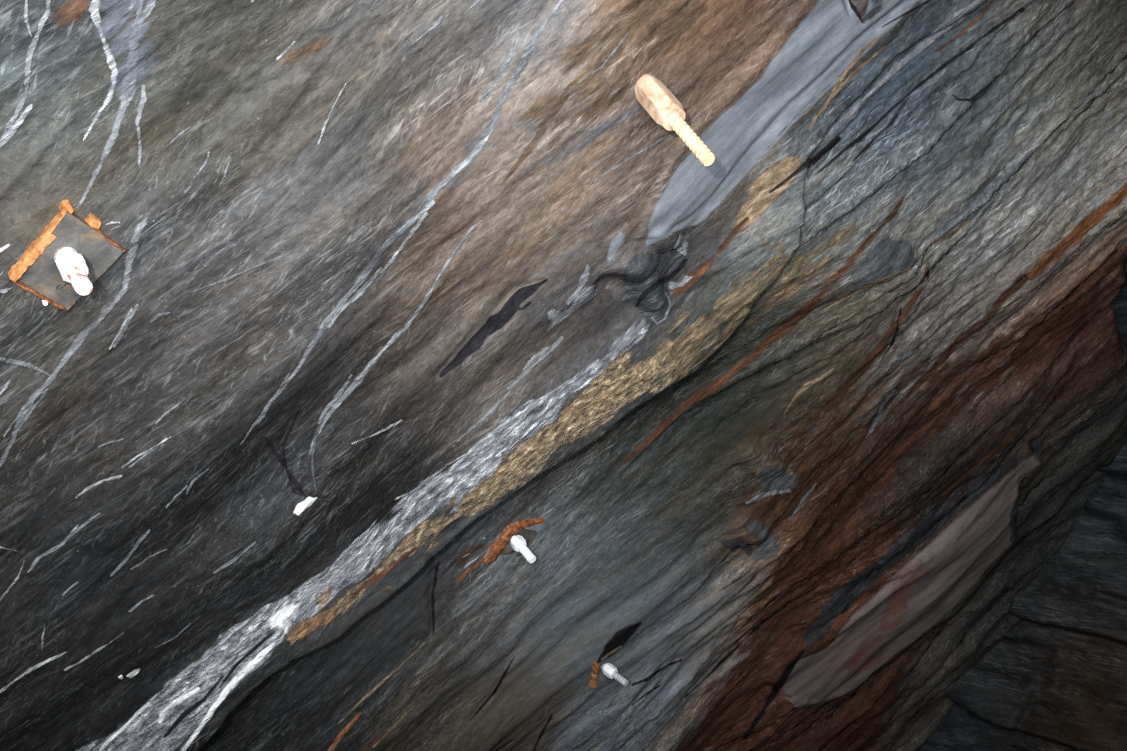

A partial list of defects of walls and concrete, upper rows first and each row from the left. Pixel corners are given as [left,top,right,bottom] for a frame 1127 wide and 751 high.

corrosion [8,212,75,311]
corrosion [93,228,126,252]
crack [439,279,547,377]
corrosion [455,523,519,583]
corrosion [590,660,600,688]